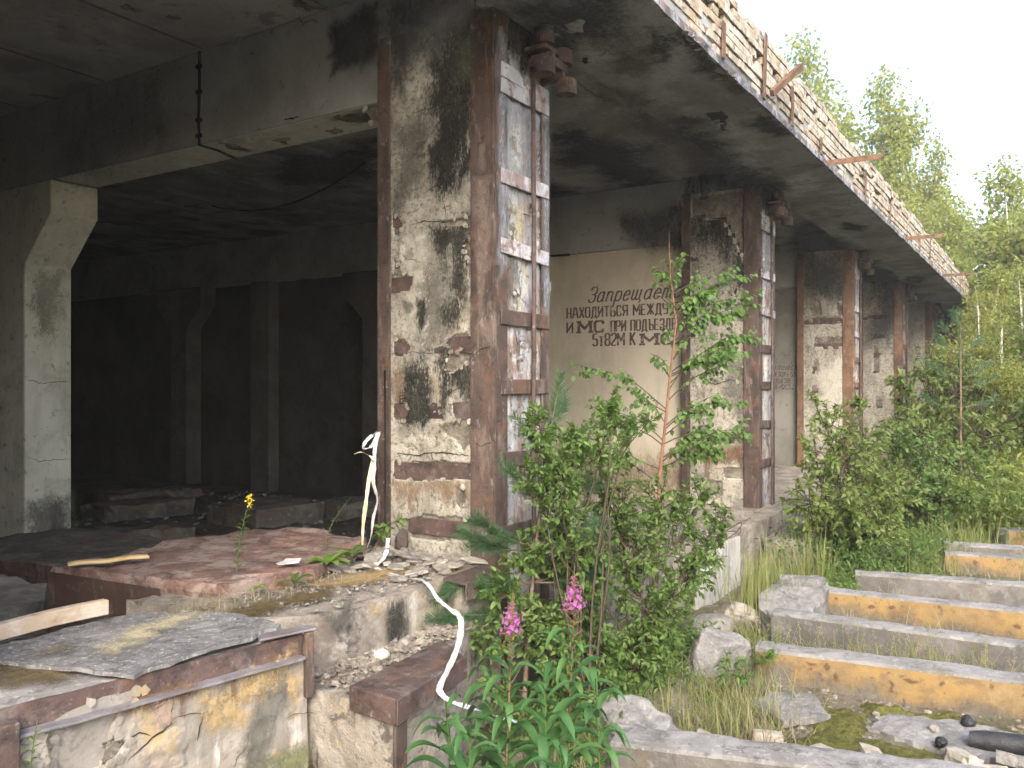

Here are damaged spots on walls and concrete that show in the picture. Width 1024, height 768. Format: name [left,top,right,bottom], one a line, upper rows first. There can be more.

damp [329,0,479,214]
peeling [391,213,432,346]
damp [399,212,470,427]
spalling [446,331,470,372]
damp [371,599,415,642]
spalling [20,685,173,768]
crack [128,691,255,760]